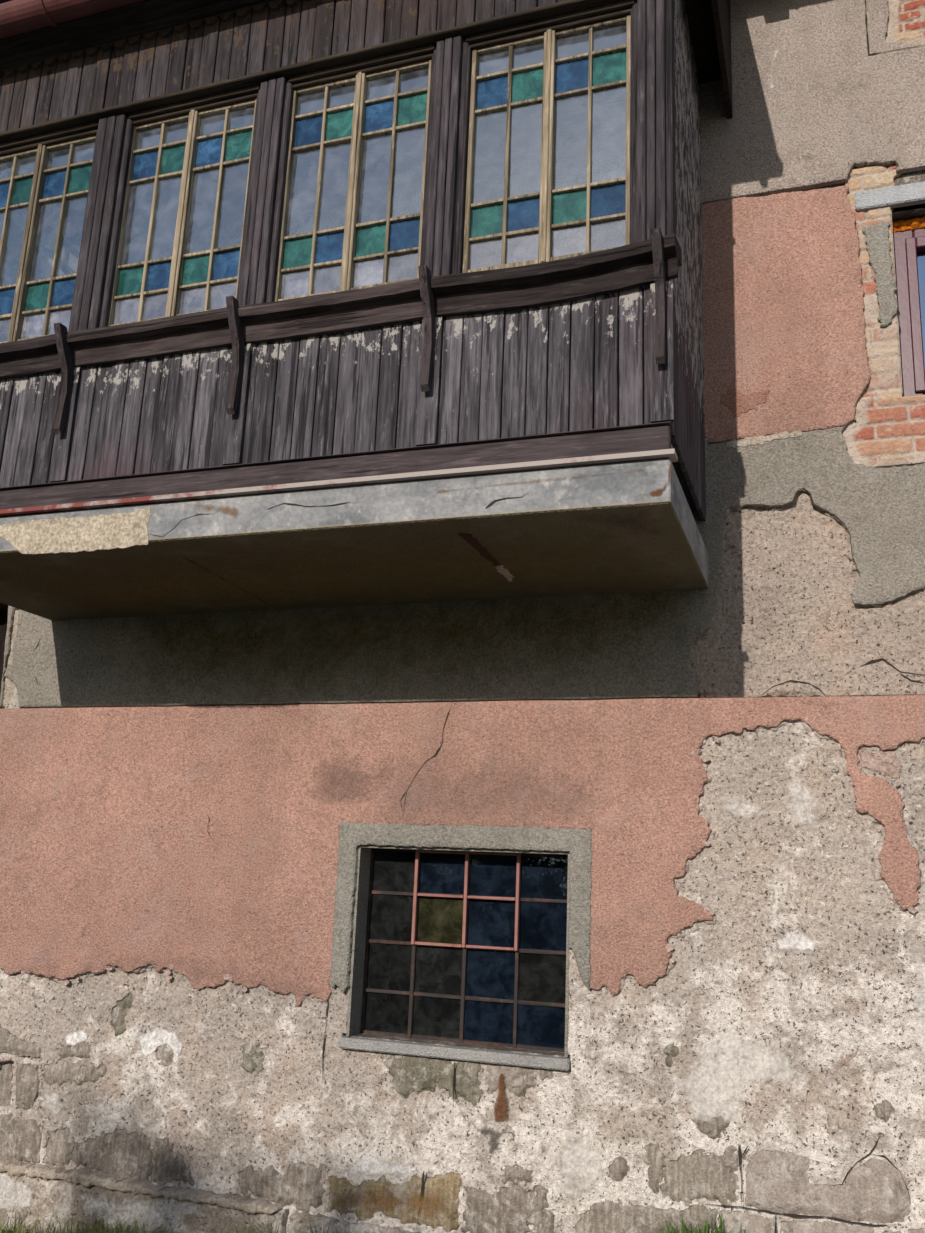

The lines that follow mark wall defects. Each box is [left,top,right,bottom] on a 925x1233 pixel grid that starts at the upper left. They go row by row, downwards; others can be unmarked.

flaking render [885,0,925,45]
flaking render [842,164,925,468]
spalling [0,507,151,554]
crack [266,502,349,510]
flaking render [690,491,925,698]
crack [860,658,923,683]
crack [400,672,474,812]
flaking render [0,718,925,1233]